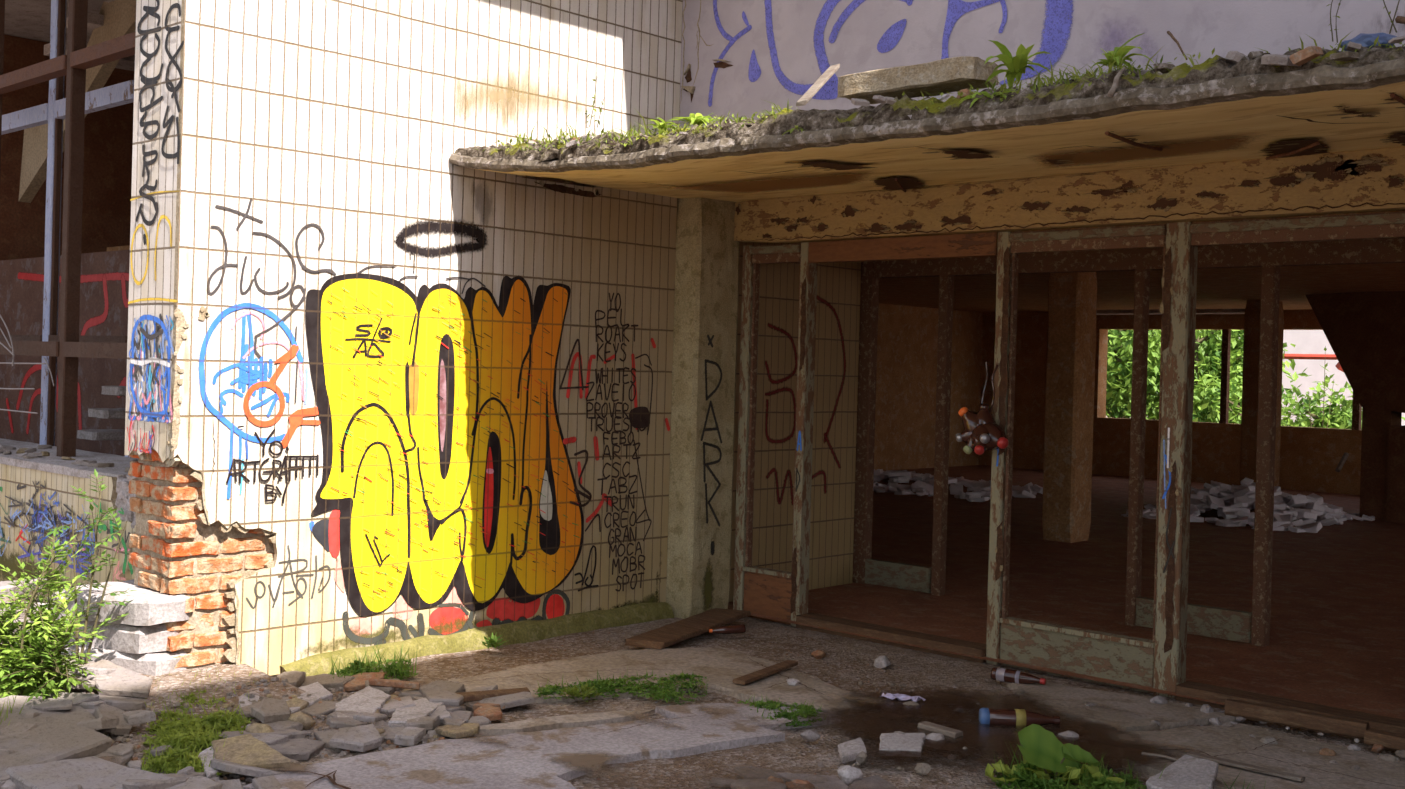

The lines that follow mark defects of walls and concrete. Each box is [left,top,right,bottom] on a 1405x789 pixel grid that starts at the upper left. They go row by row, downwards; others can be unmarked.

damp [464,83,566,112]
damp [1034,136,1252,168]
spalling [115,306,276,669]